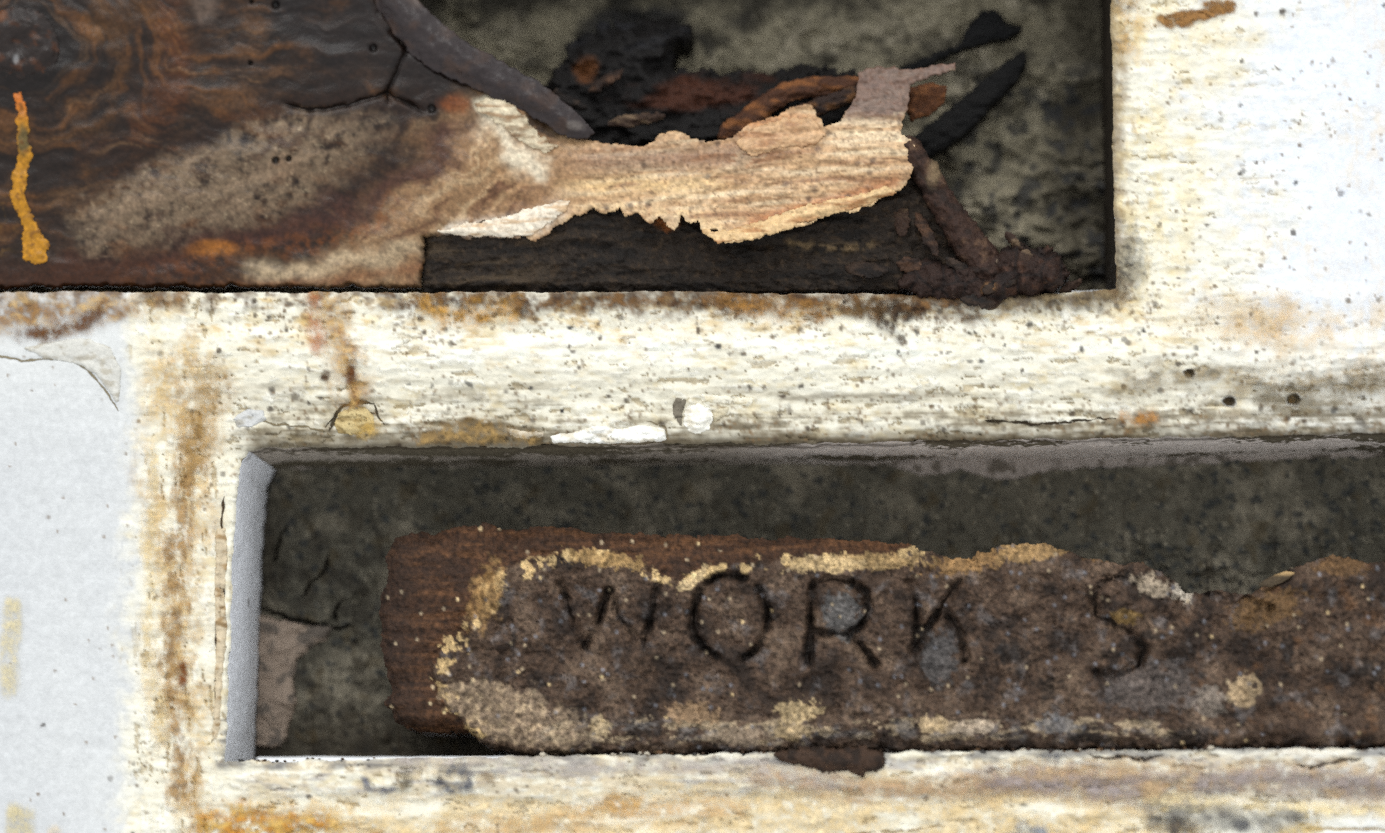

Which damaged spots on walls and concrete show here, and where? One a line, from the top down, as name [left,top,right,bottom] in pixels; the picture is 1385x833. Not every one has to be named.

rust [1156,0,1235,27]
crack [0,355,118,410]
damp [301,756,1318,833]
rust [195,803,338,833]
crack [1315,825,1385,833]